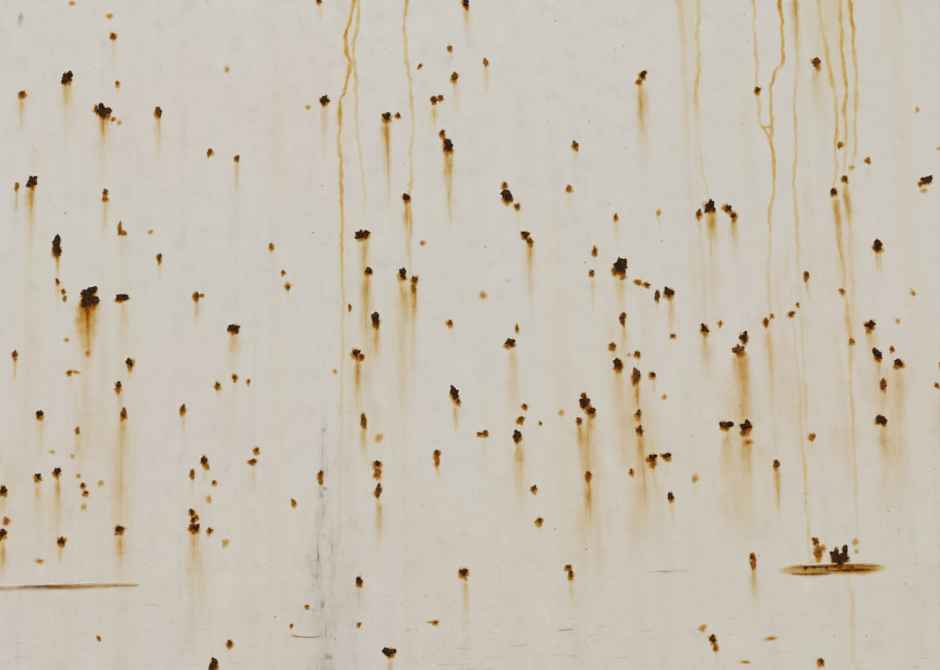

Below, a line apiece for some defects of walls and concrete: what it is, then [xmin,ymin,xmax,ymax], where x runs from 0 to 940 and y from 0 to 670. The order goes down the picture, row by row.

corrosion [94,102,115,121]
corrosion [439,130,453,153]
corrosion [499,182,520,210]
corrosion [696,199,737,222]
corrosion [51,234,62,257]
corrosion [354,229,371,240]
corrosion [612,254,675,302]
corrosion [80,285,100,319]
corrosion [732,331,748,356]
corrosion [576,393,596,425]
corrosion [719,419,752,443]
corrosion [812,537,850,568]